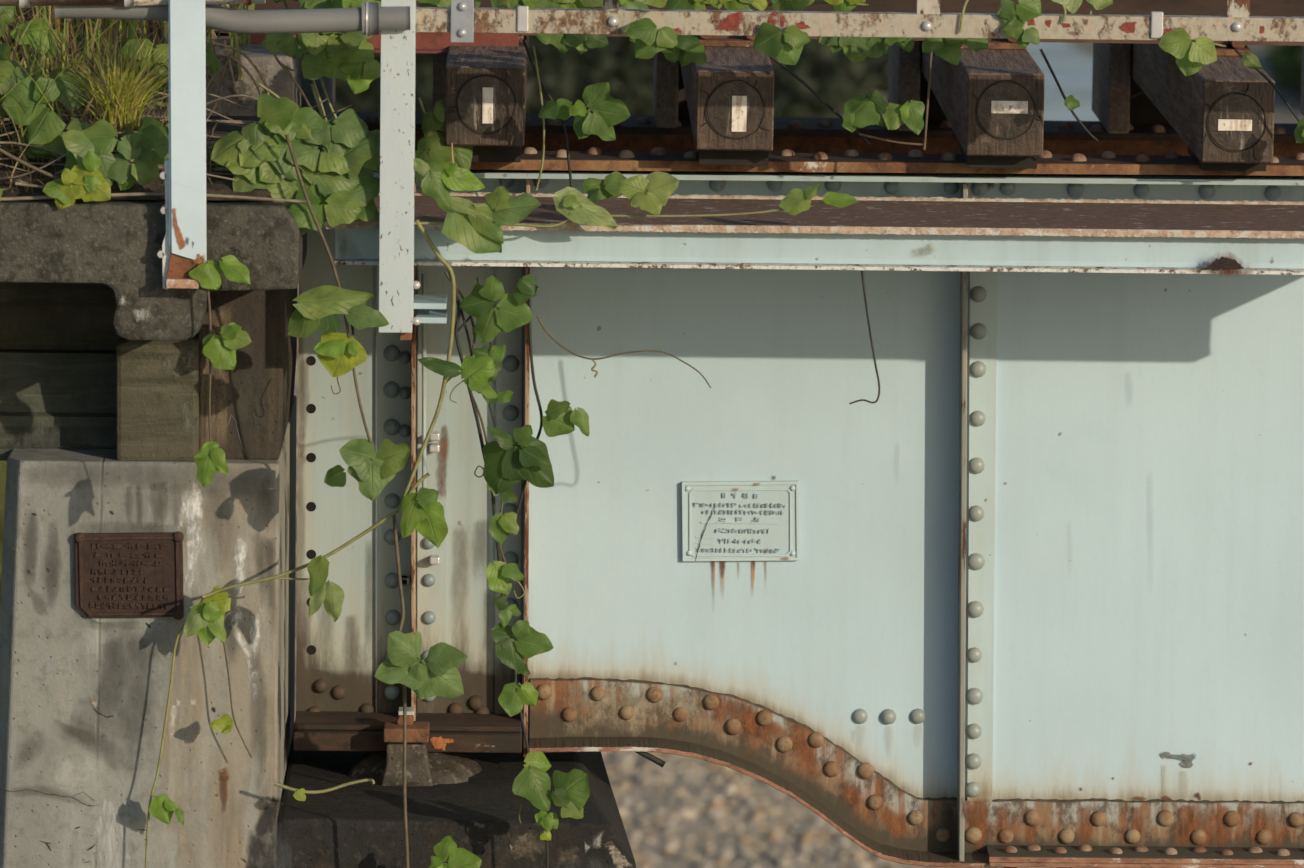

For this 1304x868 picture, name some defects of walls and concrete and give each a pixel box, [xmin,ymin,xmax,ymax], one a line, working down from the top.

peeling [767,11,810,29]
peeling [1119,21,1137,33]
corrosion [172,208,205,264]
corrosion [1201,254,1244,276]
damp [180,490,202,583]
damp [235,539,246,591]
corrosion [712,561,755,586]
damp [230,612,259,695]
damp [169,699,196,737]
corrosion [591,696,696,731]
corrosion [430,736,454,750]
corrosion [220,770,229,806]